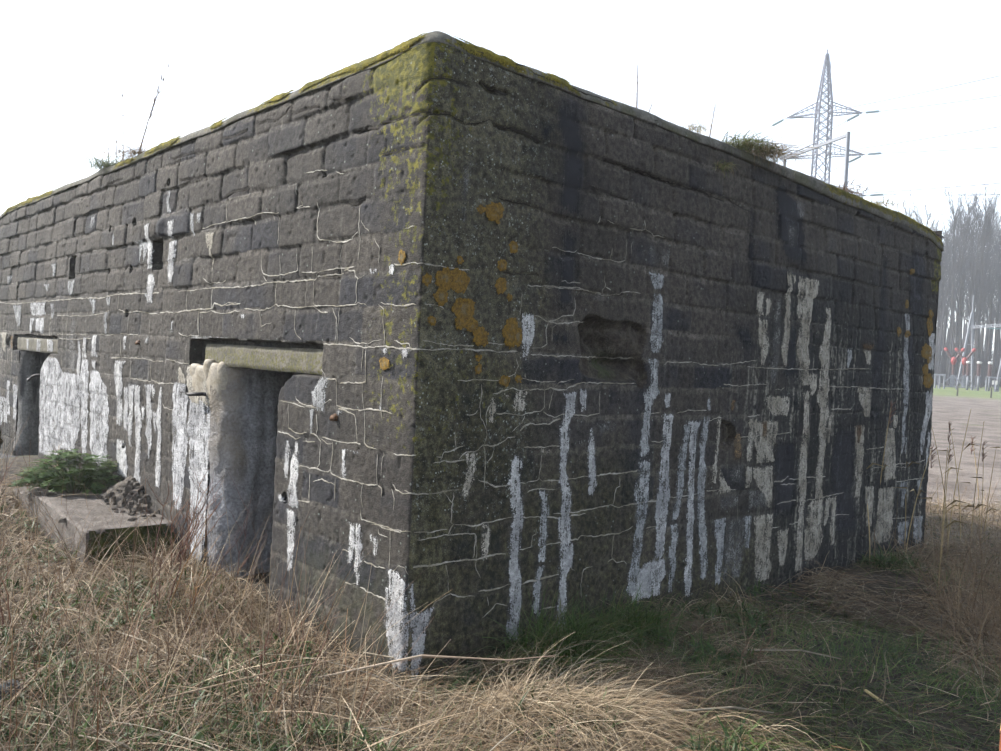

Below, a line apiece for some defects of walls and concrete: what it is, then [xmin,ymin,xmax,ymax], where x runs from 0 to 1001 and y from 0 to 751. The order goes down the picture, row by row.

crack [511,61,614,104]
crack [604,159,750,212]
leakage [13,264,211,560]
leakage [278,441,299,570]
leakage [348,524,378,585]
crack [0,187,735,618]
leakage [506,389,616,641]
leakage [626,180,927,603]
crack [664,360,896,410]
crack [772,476,849,528]
crack [867,447,926,482]
leakage [384,569,434,678]